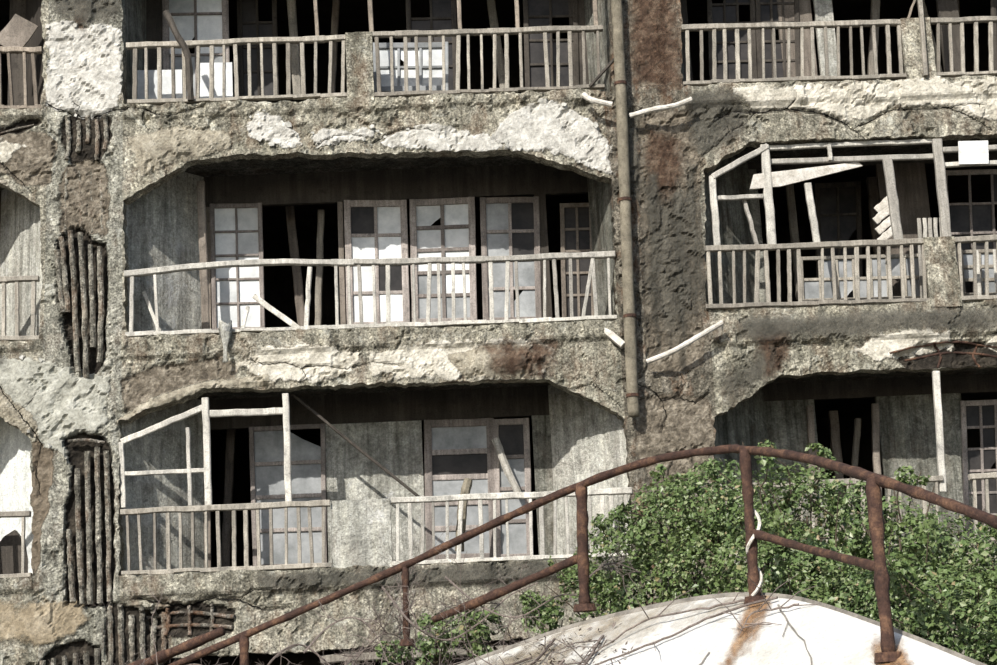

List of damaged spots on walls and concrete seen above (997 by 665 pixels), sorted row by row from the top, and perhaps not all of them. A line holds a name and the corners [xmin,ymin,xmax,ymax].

rust [631,0,681,90]
peeling [246,98,612,175]
crack [701,98,992,157]
spalling [0,15,555,665]
spalling [852,328,997,370]
rust [727,595,768,664]
rust [876,644,909,665]